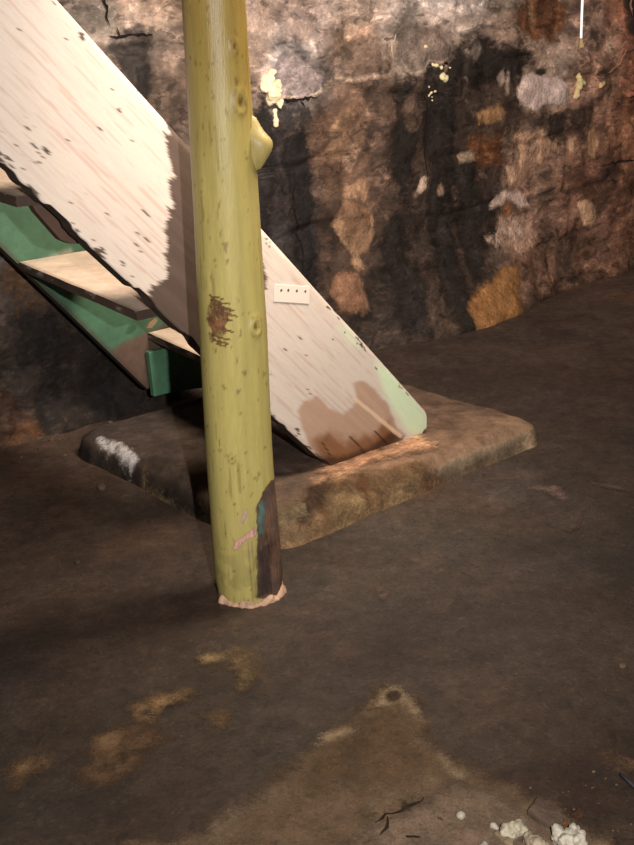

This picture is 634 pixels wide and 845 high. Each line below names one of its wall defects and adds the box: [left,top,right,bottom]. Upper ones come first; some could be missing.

crack [103,0,152,39]
water stain [255,95,322,291]
water stain [381,33,585,343]
water stain [588,128,599,158]
spalling [256,462,445,598]